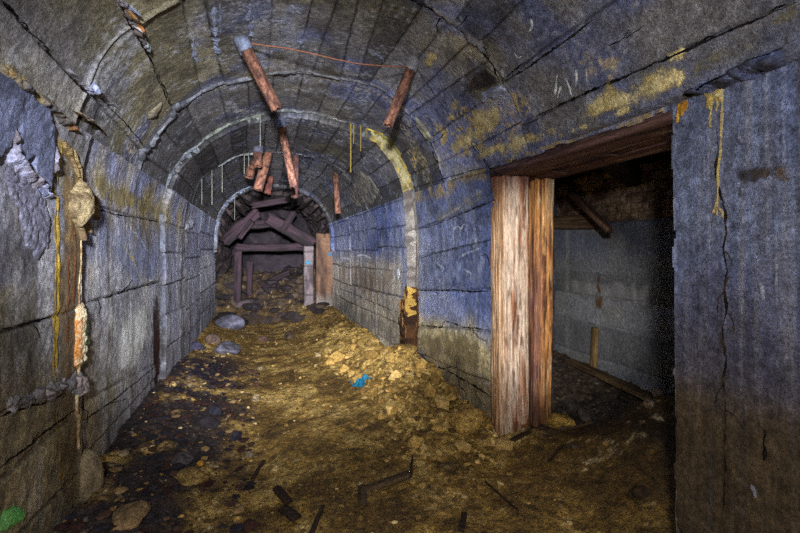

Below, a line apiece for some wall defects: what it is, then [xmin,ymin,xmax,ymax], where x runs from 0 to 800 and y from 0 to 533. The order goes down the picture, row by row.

flaking render [0,64,103,260]
damp [368,128,419,289]
damp [454,108,499,151]
damp [481,130,550,157]
damp [588,48,686,116]
damp [676,99,689,123]
damp [704,89,724,219]
damp [51,139,90,503]
crack [714,128,743,532]